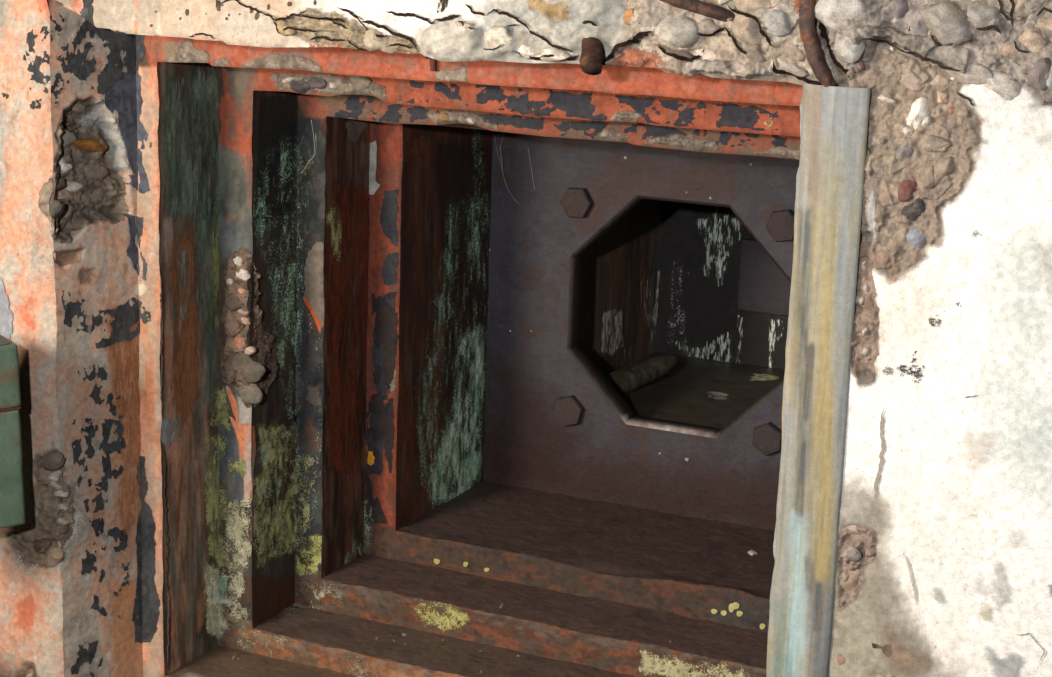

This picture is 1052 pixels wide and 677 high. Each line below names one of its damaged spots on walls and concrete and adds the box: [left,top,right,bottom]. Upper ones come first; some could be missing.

spalling [8,365,160,643]
spalling [23,0,151,280]
rust [109,327,141,535]
rust [164,218,202,425]
crack [189,32,214,40]
spalling [220,246,279,499]
peeling [303,242,324,334]
spalling [168,0,800,166]
spalling [386,0,1052,385]
damp [828,486,929,677]